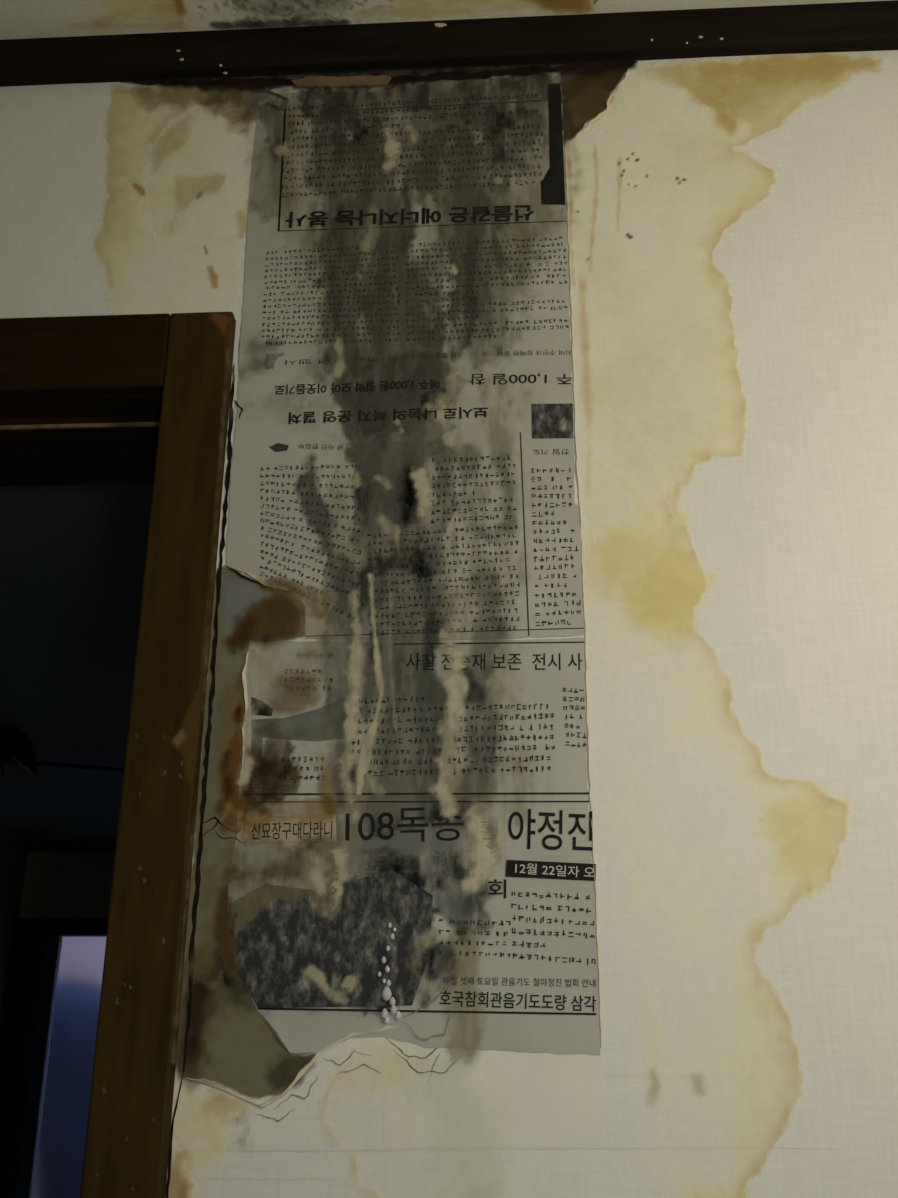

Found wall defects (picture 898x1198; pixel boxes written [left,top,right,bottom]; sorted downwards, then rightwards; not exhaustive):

water stain [211,0,376,29]
water stain [392,0,587,17]
rust [230,578,326,649]
water stain [94,73,564,1058]
water stain [567,53,878,1198]
rust [198,675,339,973]
peeling [176,565,398,1108]